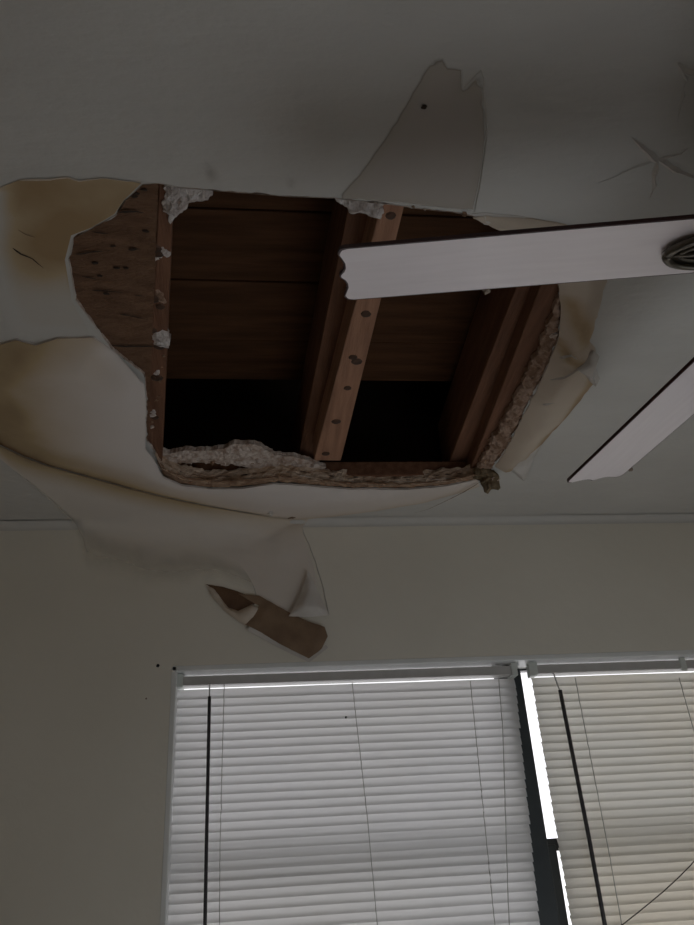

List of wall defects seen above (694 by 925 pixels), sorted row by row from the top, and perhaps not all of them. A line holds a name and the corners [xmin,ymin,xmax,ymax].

leakage [0,177,141,337]
spalling [70,184,164,441]
peeling [472,213,566,231]
peeling [476,280,607,482]